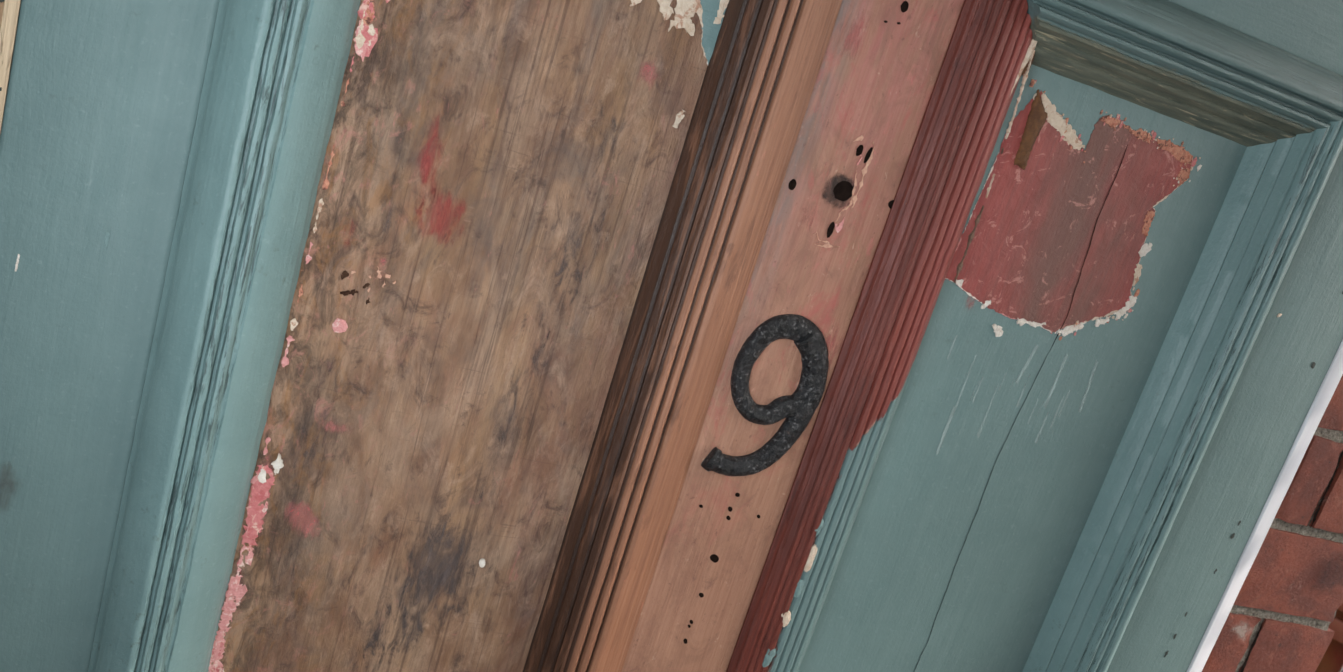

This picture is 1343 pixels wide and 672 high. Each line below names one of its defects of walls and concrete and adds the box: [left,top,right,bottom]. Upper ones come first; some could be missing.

peeling [341,0,390,107]
peeling [630,0,729,65]
peeling [672,109,685,128]
peeling [306,145,335,264]
peeling [945,50,1202,340]
peeling [281,318,298,367]
peeling [208,437,284,672]